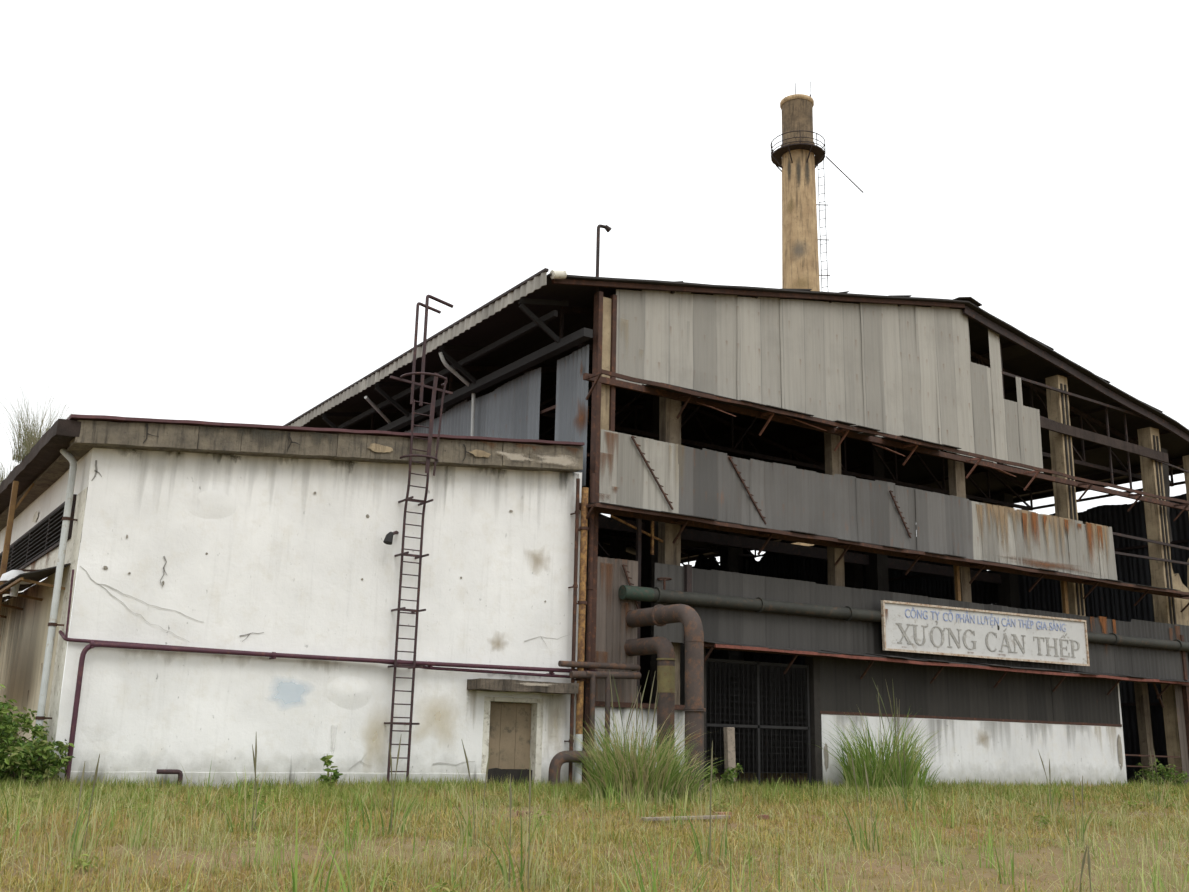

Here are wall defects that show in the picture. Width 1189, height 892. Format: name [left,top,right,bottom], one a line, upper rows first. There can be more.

spalling [368,443,393,453]
spalling [470,449,577,466]
corrosion [976,503,1108,554]
crack [80,556,202,642]